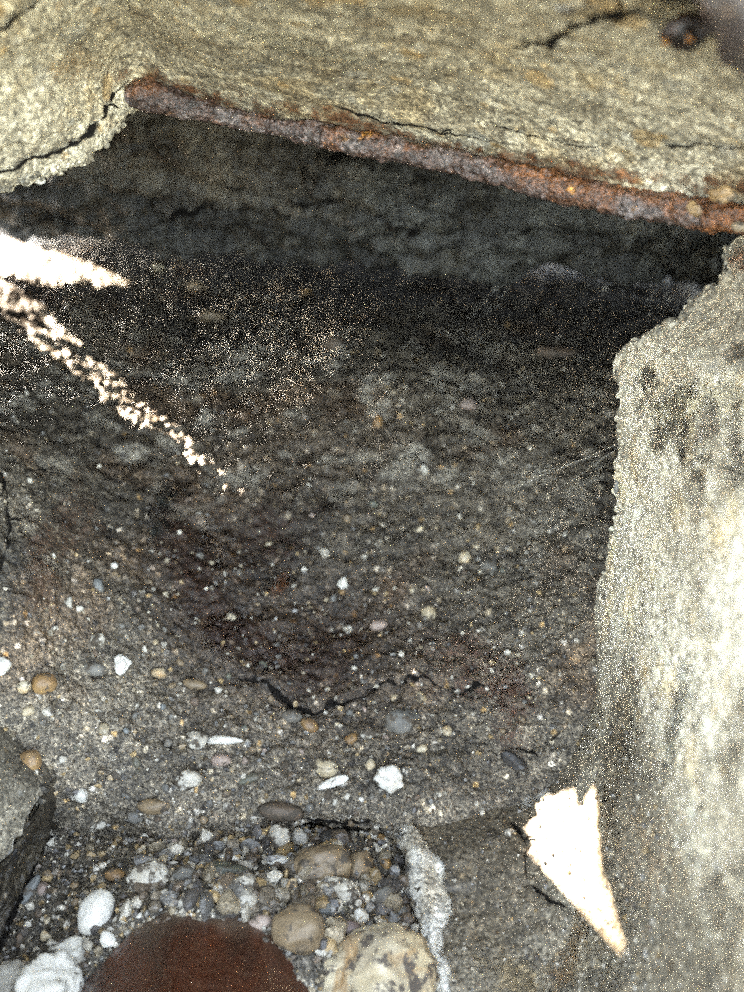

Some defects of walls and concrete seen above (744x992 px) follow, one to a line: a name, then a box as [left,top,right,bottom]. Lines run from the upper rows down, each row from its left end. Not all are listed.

crack [0,0,38,32]
crack [516,0,700,50]
crack [0,75,135,174]
rust [124,70,744,236]
crack [238,674,485,716]
crack [434,712,560,757]
crack [0,846,44,952]
crack [511,822,572,911]